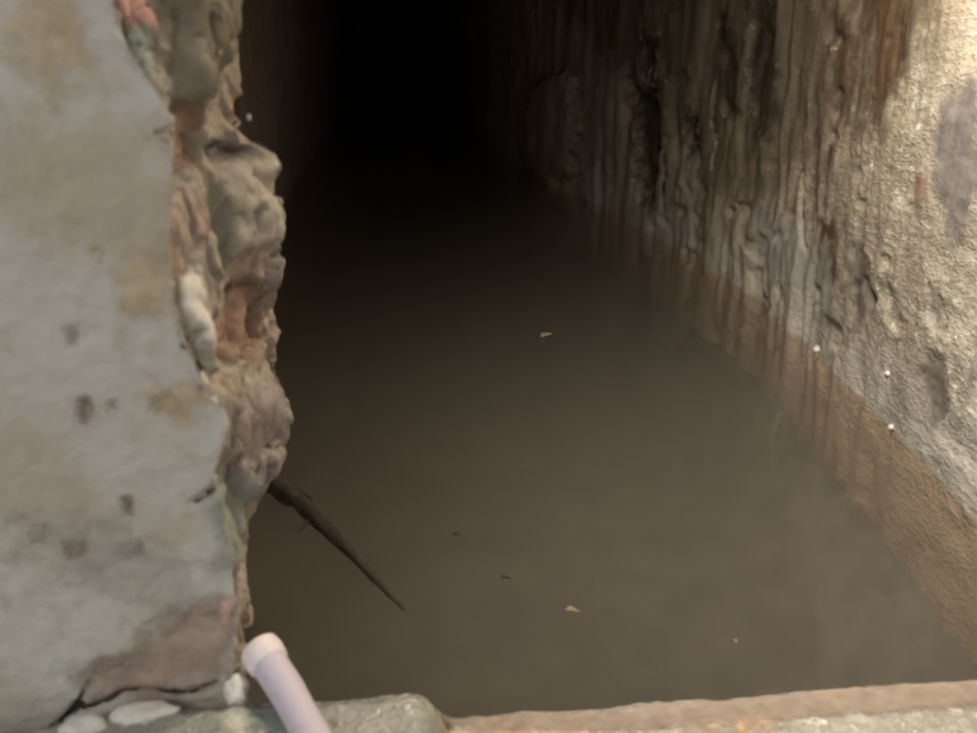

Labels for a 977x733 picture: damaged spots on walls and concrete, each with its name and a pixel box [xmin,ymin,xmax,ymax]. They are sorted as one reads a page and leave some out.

spalling [113,0,158,80]
leakage [721,13,737,116]
leakage [746,0,779,142]
leakage [864,0,912,120]
spalling [168,102,206,166]
spalling [213,274,266,363]
leakage [752,202,839,325]
leakage [848,249,876,327]
leakage [925,358,947,421]
spalling [68,597,239,701]